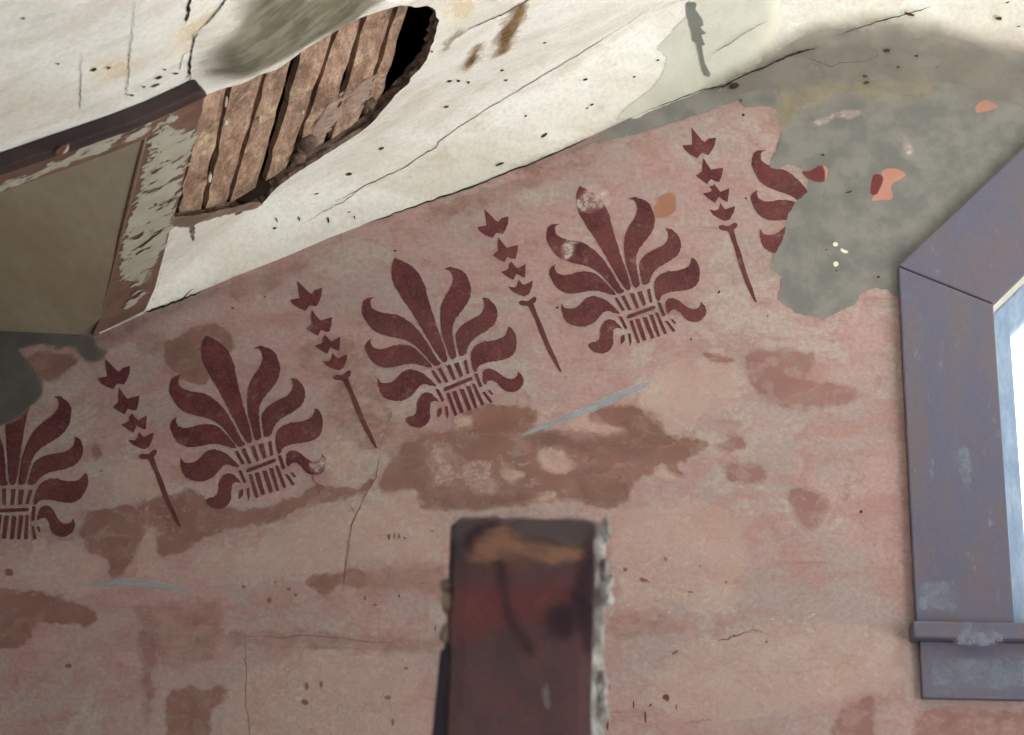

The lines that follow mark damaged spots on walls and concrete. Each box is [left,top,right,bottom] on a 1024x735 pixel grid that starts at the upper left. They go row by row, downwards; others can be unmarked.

peeling [0,5,439,310]
crack [306,11,645,225]
water stain [463,3,527,71]
flaking render [587,0,1024,319]
water stain [746,350,855,408]
crack [342,412,392,595]
water stain [80,404,707,578]